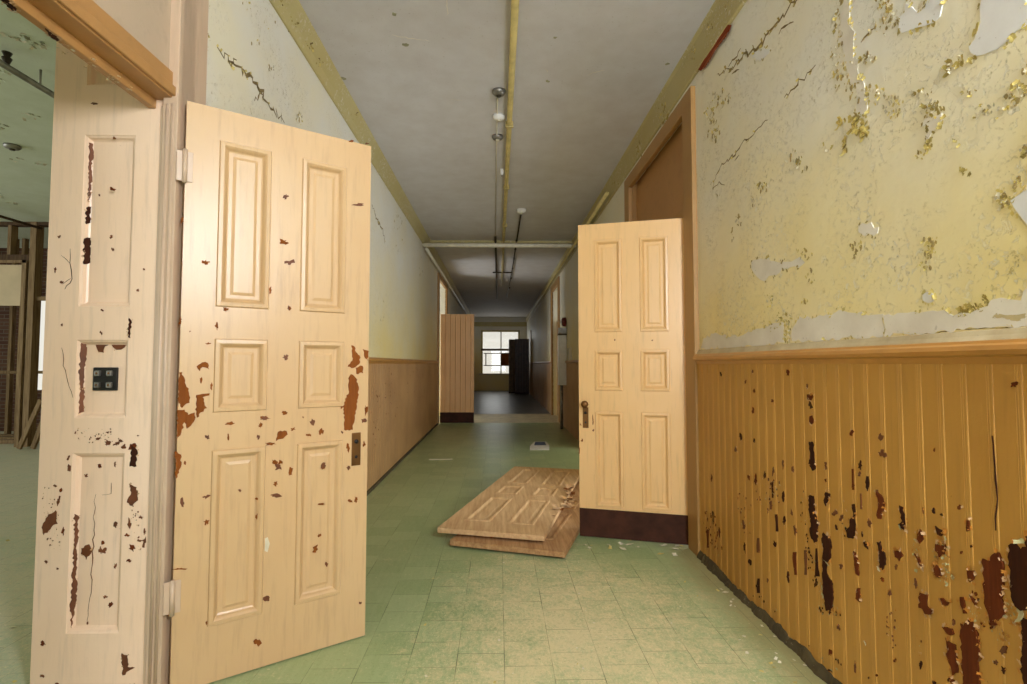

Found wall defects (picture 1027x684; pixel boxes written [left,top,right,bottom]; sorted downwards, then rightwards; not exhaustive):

crack [216,44,284,122]
peeling [698,25,731,71]
crack [718,0,797,76]
peeling [822,0,948,160]
peeling [941,0,1027,78]
crack [713,120,767,188]
peeling [994,176,1027,224]
peeling [849,221,879,259]
peeling [918,236,938,271]
peeling [701,248,1027,350]
peeling [806,384,816,426]
peeling [703,511,722,549]